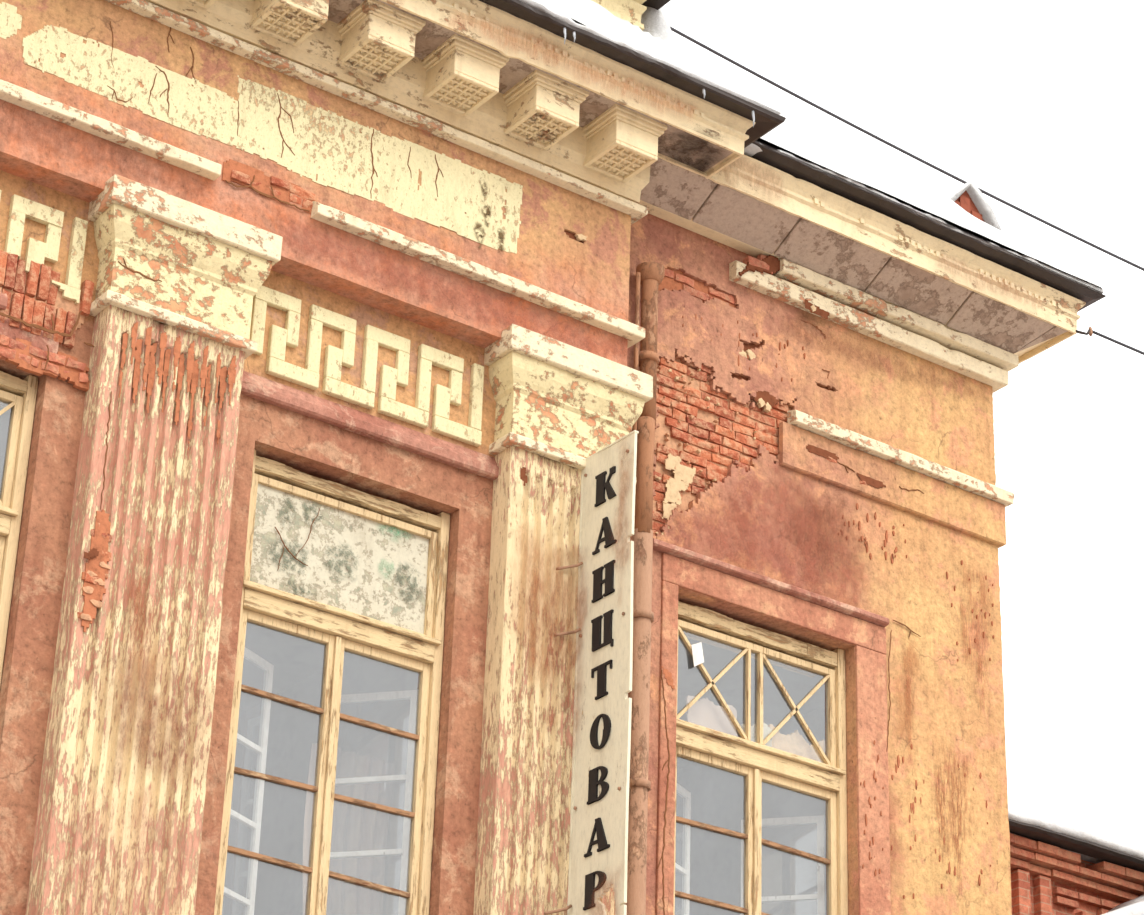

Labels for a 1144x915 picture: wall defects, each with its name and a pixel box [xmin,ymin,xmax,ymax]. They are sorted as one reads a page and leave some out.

crack [107,21,196,117]
peeling [0,2,523,254]
crack [225,175,310,212]
crack [277,93,295,158]
crack [370,129,378,195]
crack [407,147,443,197]
spalling [0,250,94,392]
peeling [118,322,237,451]
spalling [711,321,762,381]
spalling [652,357,791,536]
spalling [75,509,112,632]
crack [275,508,320,571]